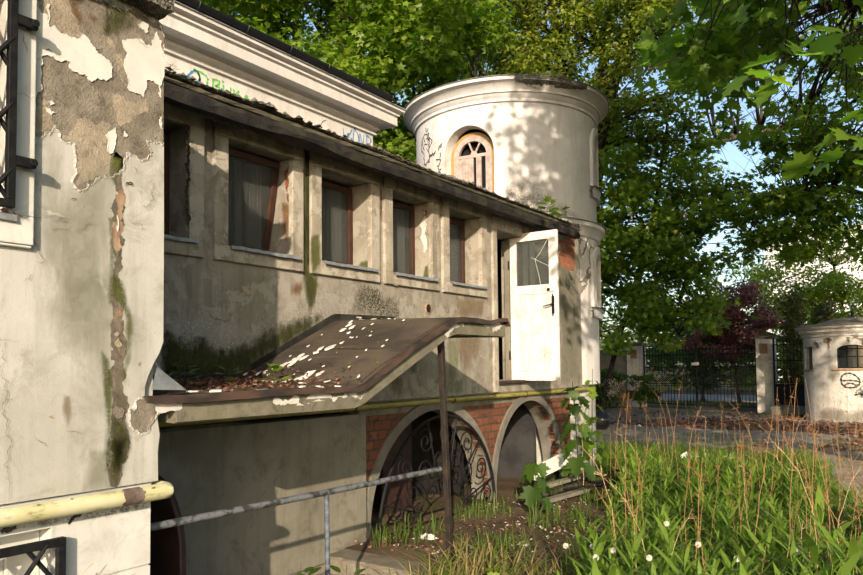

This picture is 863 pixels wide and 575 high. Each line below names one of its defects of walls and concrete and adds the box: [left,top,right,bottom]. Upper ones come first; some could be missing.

peeling [35,0,182,487]
water stain [165,276,399,375]
crack [0,339,19,494]
water stain [90,359,130,486]
peeling [273,386,364,405]